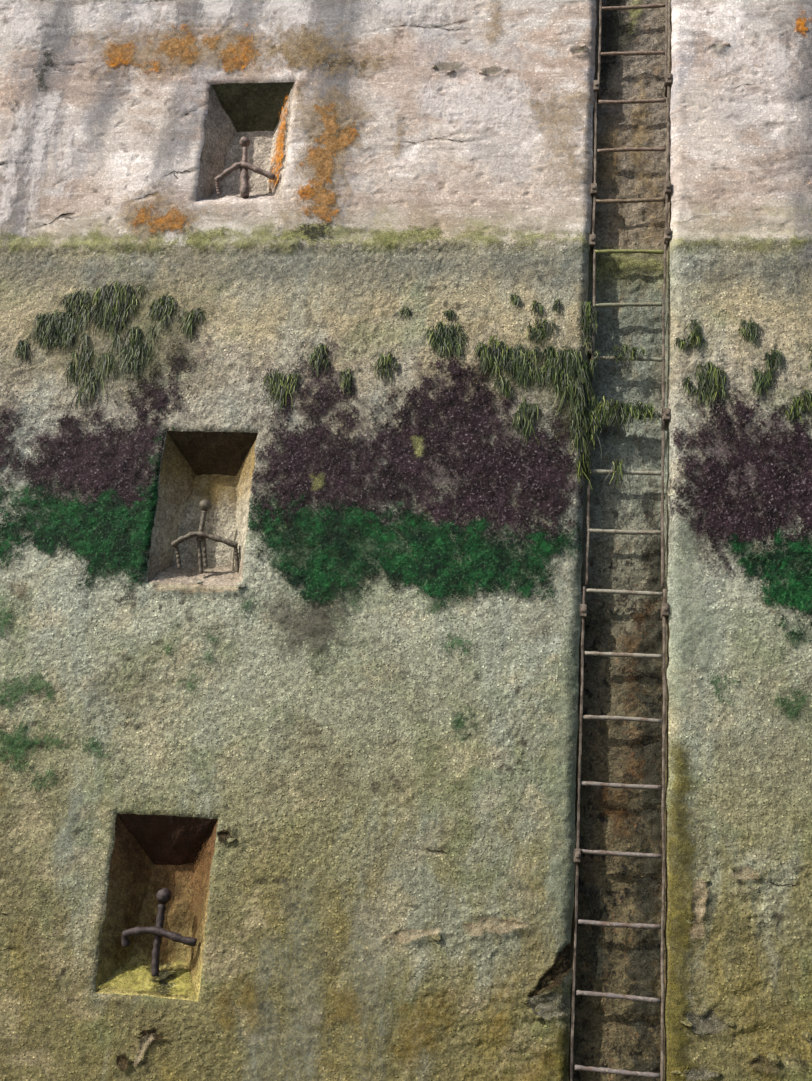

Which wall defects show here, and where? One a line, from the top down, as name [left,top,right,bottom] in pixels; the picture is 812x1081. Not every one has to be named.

water stain [707,1,812,83]
water stain [0,0,65,236]
spalling [522,944,572,1020]